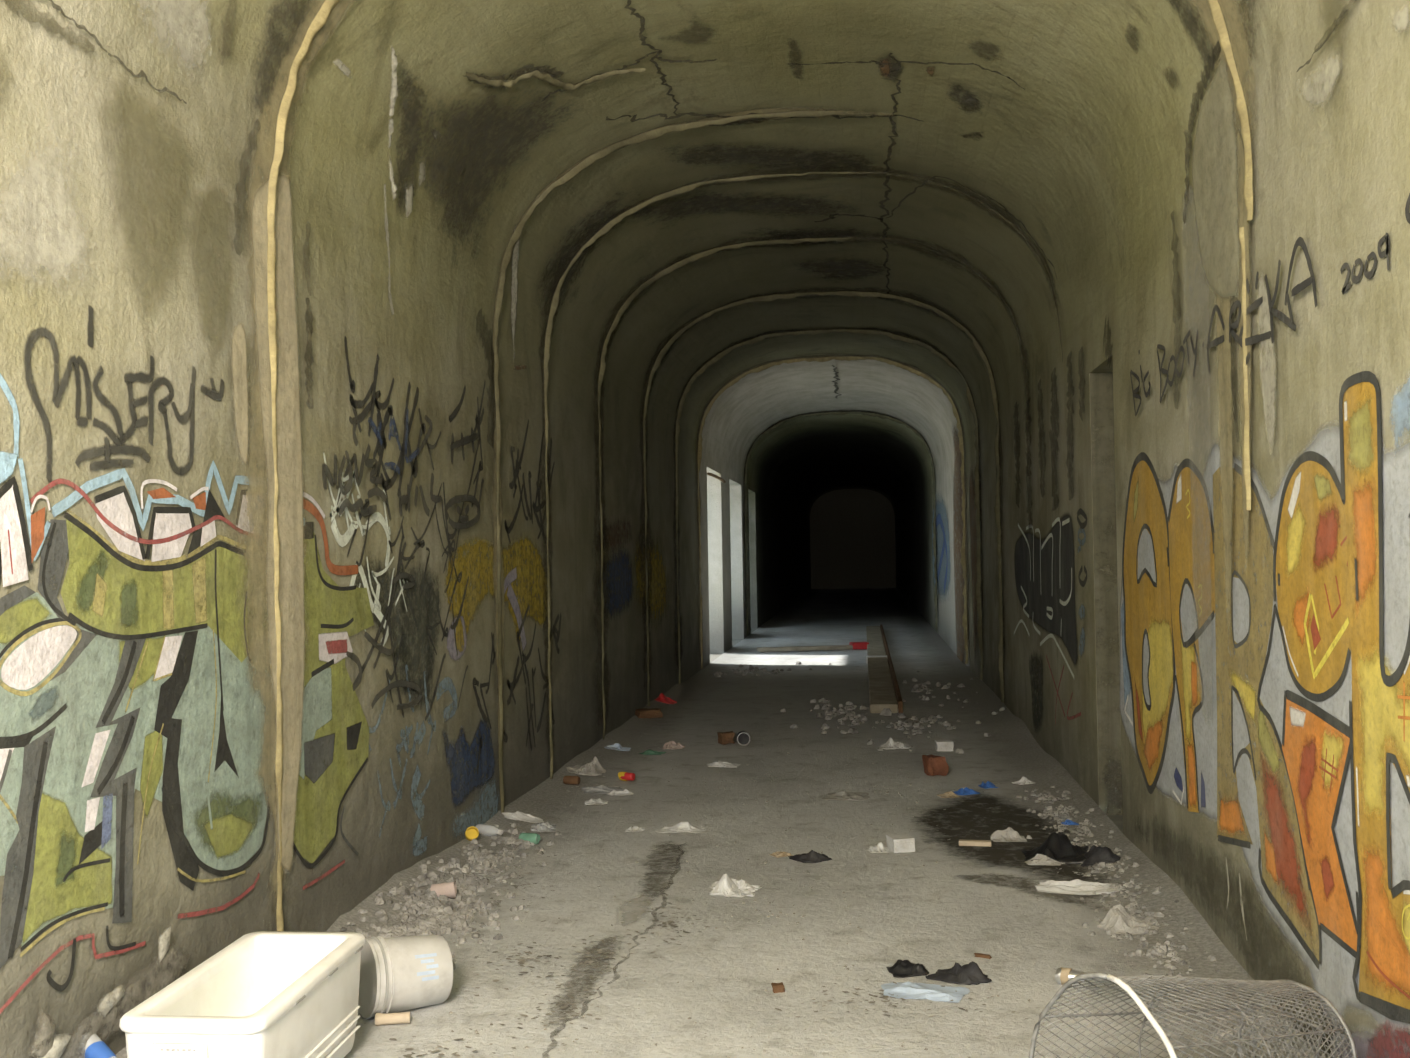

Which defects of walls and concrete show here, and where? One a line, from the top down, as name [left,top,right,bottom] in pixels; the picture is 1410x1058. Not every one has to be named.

crack [5,0,187,104]
damp [417,64,646,253]
crack [542,0,1058,291]
crack [1297,0,1356,72]
damp [1169,0,1275,635]
damp [232,0,354,931]